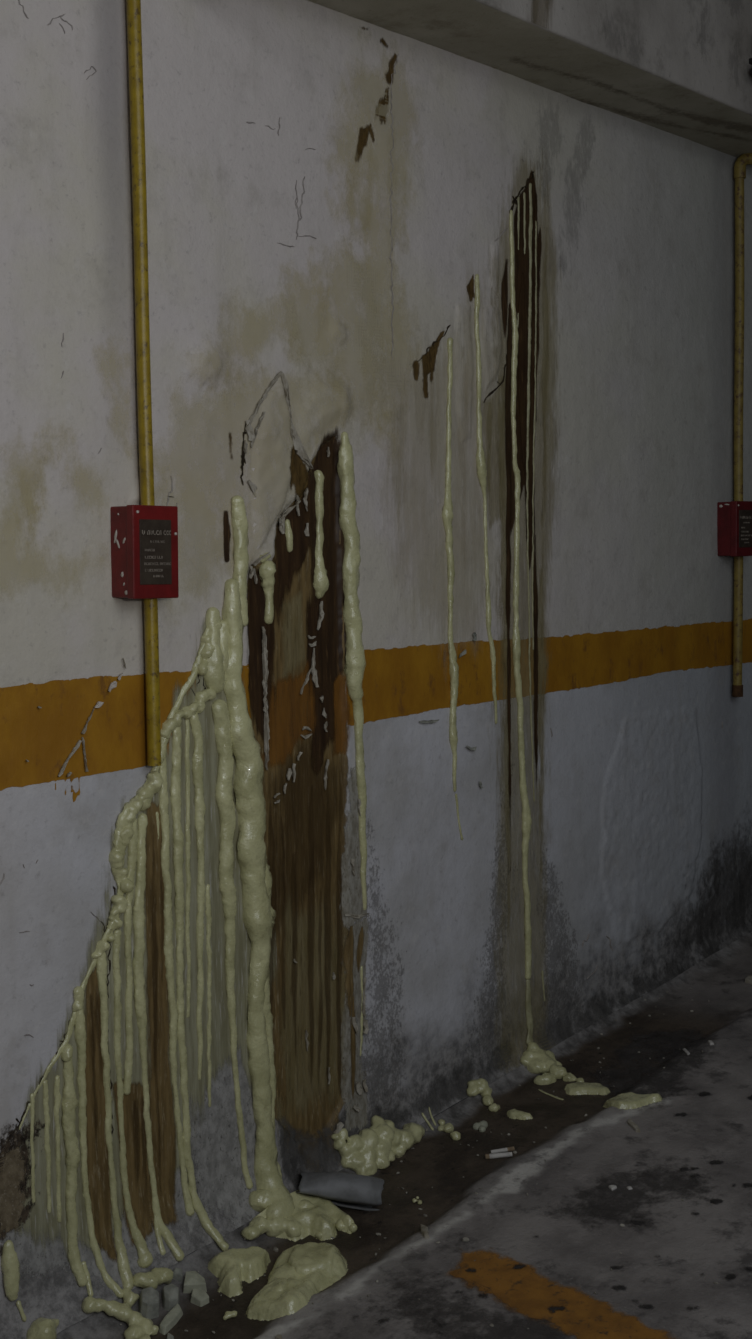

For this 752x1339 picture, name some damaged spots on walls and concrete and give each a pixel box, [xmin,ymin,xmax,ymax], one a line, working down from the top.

rust [290,446,308,501]
damp [442,337,464,840]
damp [474,274,498,724]
rust [501,171,542,824]
damp [489,183,752,1098]
spalling [0,1046,259,1295]
rust [85,802,177,1260]
damp [1,432,480,1339]
rust [340,914,370,1131]